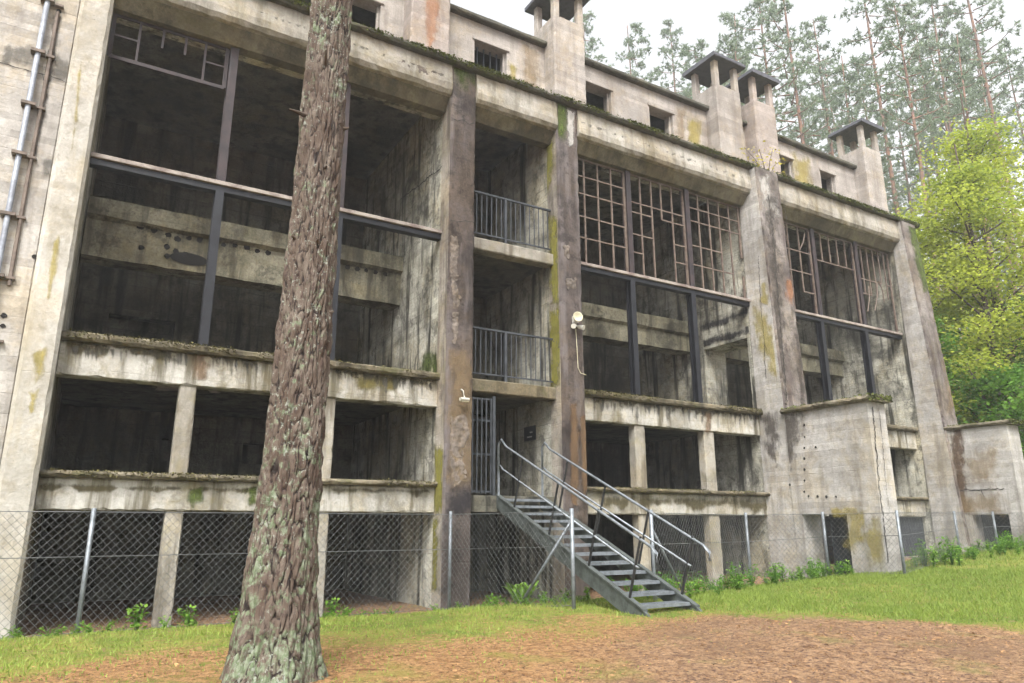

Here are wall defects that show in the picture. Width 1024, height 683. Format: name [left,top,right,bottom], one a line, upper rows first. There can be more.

water stain [594,196,805,460]
spalling [449,414,470,487]
crack [872,407,890,561]